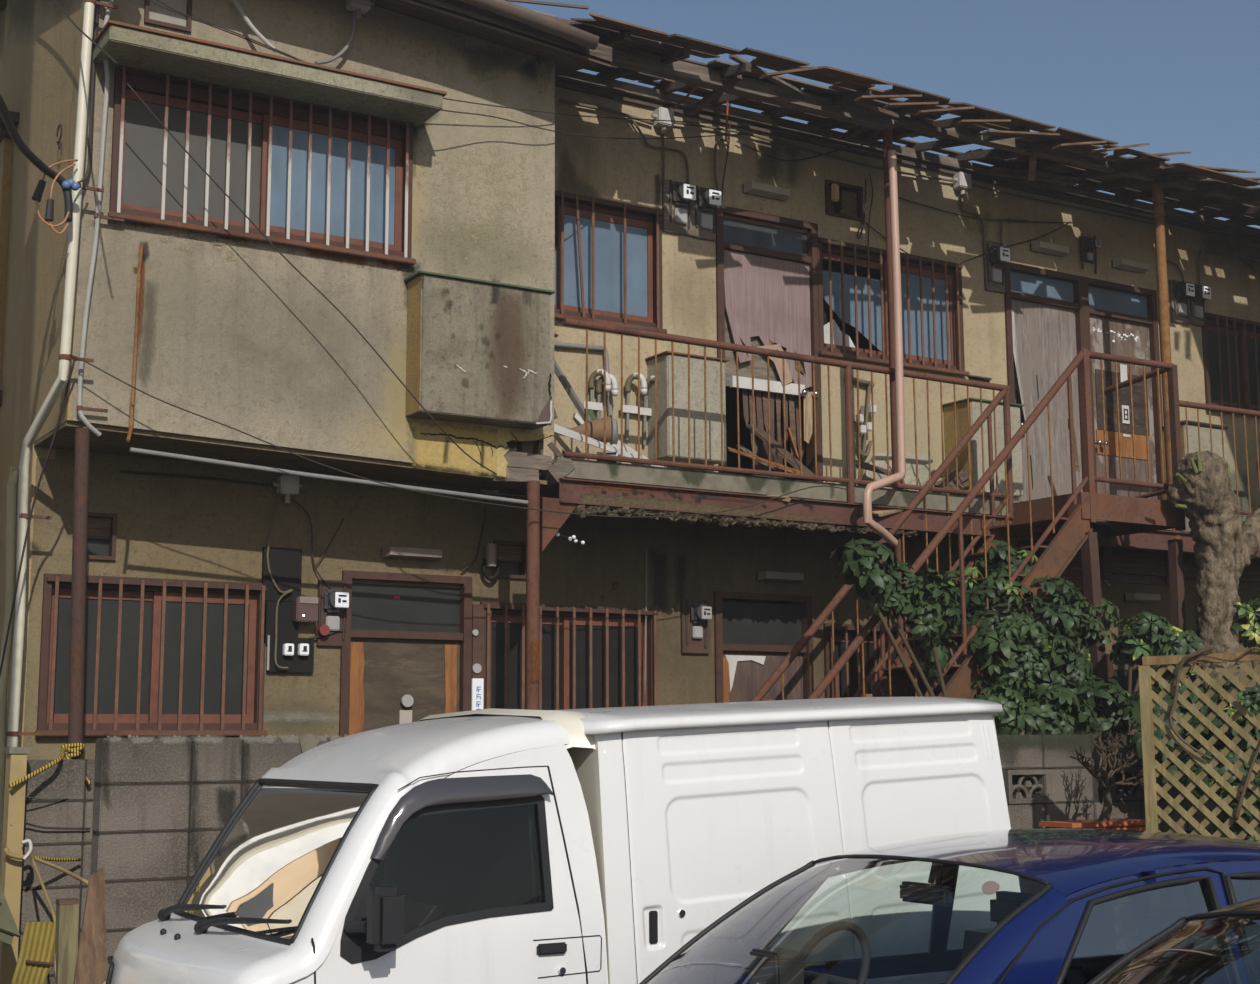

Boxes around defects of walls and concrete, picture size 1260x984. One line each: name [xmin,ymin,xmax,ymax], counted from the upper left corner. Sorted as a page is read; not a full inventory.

rust [308,249,403,270]
rust [134,243,148,339]
rust [583,482,706,502]
rust [722,494,784,507]
spalling [574,493,918,537]
rust [856,507,933,519]